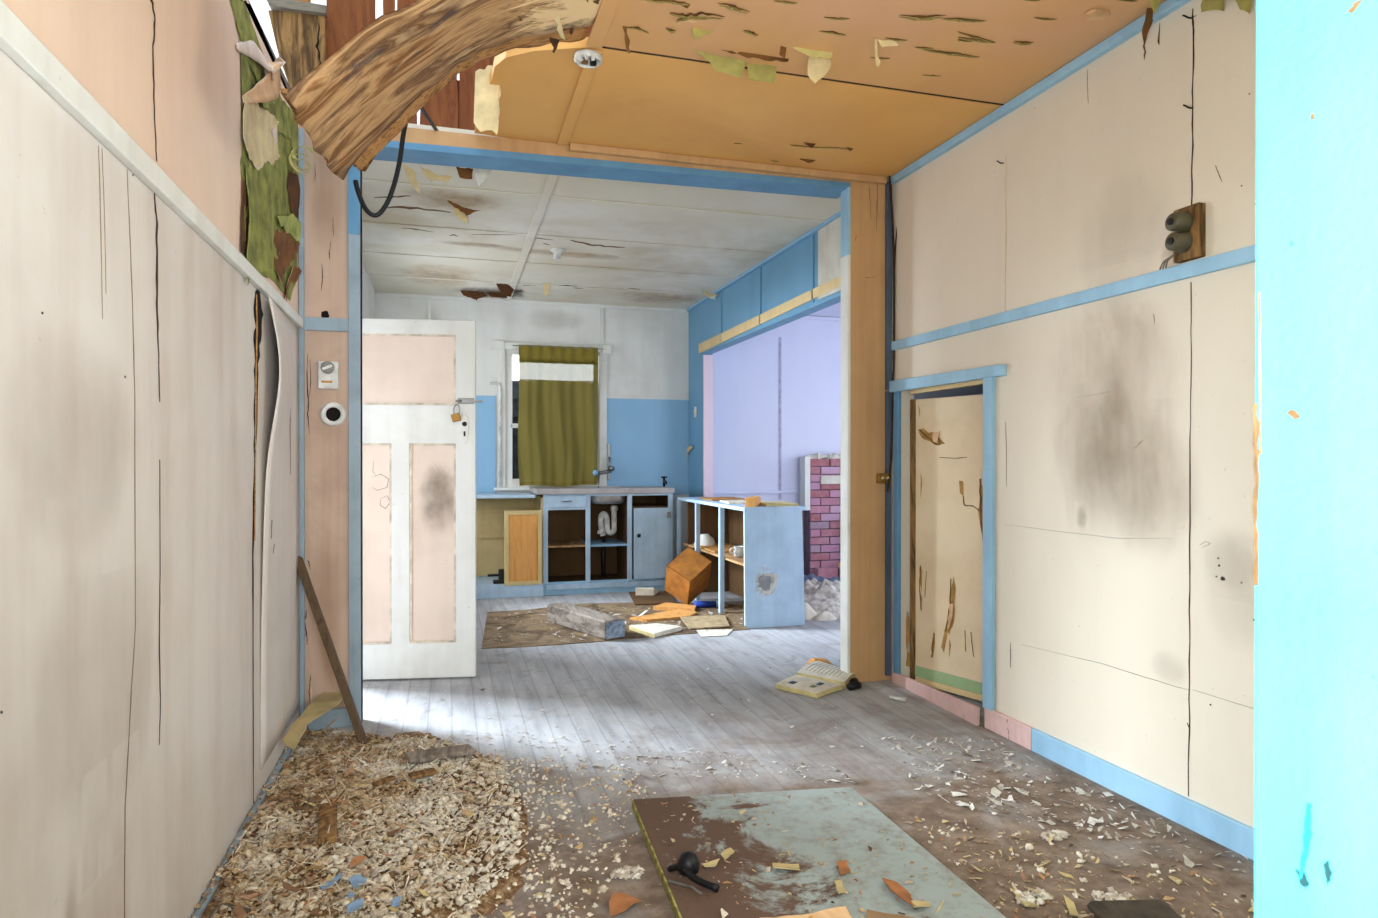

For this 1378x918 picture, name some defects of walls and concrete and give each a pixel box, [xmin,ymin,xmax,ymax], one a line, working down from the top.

peeling [550,15,574,53]
peeling [622,26,630,54]
peeling [681,5,833,83]
peeling [874,39,899,67]
peeling [1142,0,1160,60]
peeling [1201,0,1252,14]
peeling [474,65,501,135]
peeling [230,0,314,302]
peeling [918,406,967,459]
peeling [959,479,983,542]
peeling [906,564,927,667]
peeling [931,577,974,658]